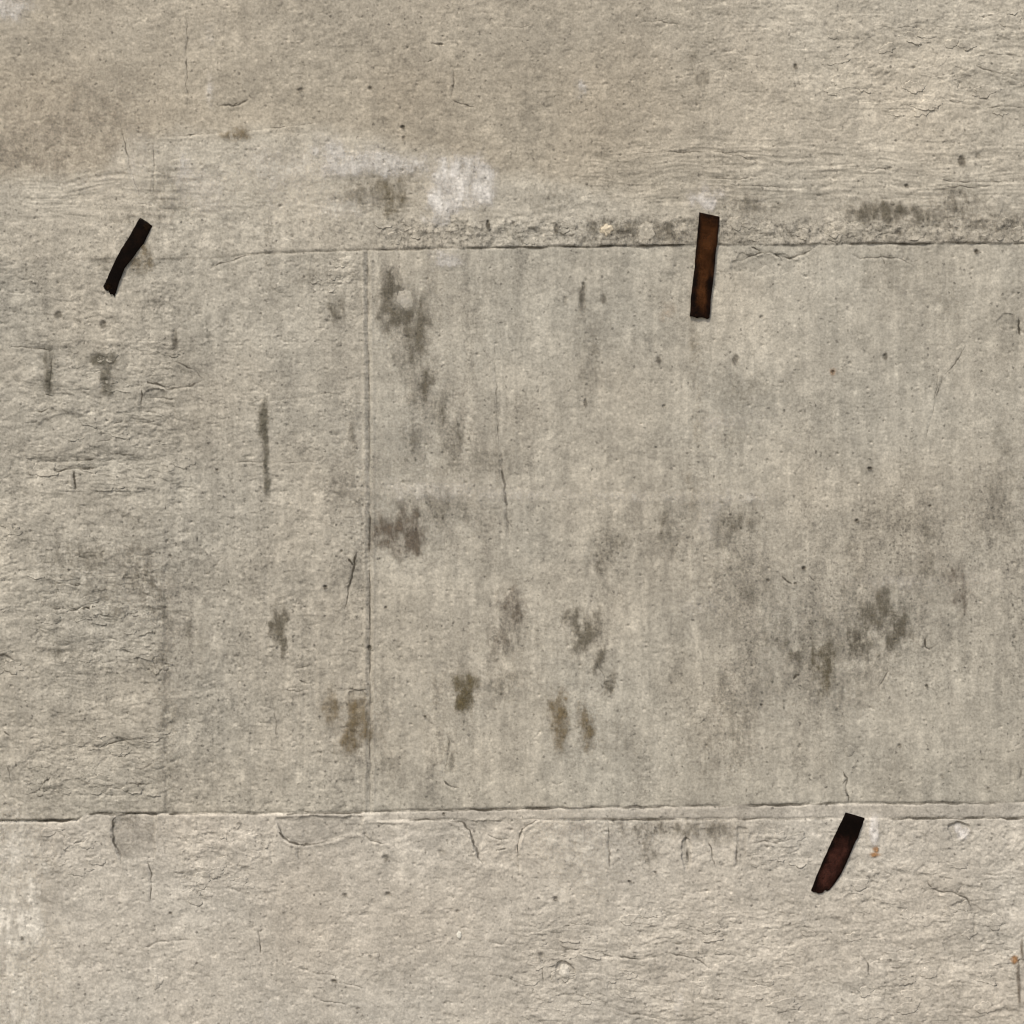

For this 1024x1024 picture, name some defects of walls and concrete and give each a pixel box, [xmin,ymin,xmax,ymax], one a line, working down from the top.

corrosion [697,223,716,304]
damp [378,272,430,360]
damp [421,371,434,396]
damp [259,403,270,492]
damp [374,484,437,556]
damp [564,610,597,650]
damp [864,590,906,649]
corrosion [819,842,848,886]